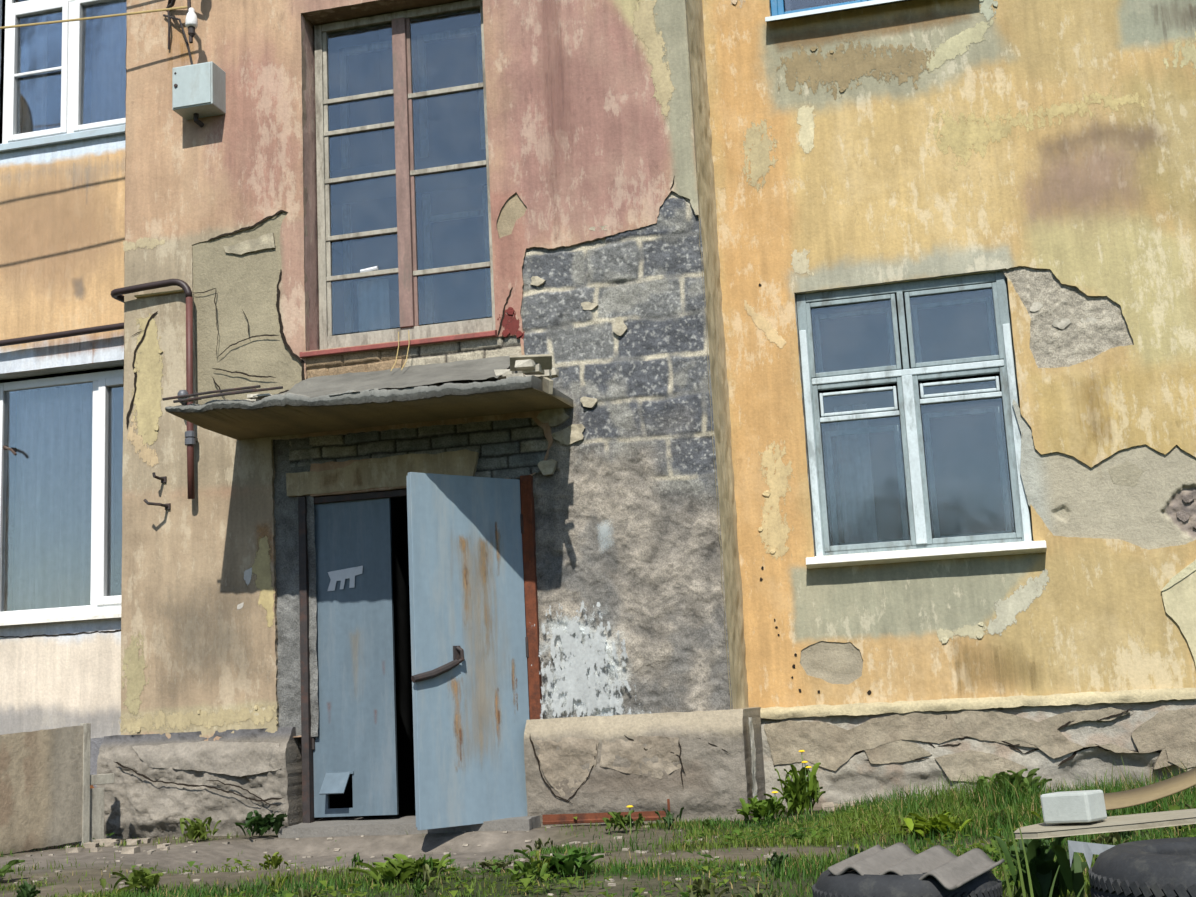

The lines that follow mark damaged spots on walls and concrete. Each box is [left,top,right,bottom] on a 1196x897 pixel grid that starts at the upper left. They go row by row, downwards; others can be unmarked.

peeling [633,0,676,123]
peeling [776,0,998,153]
crack [126,311,158,428]
spalling [1002,267,1133,368]
spalling [119,191,733,777]
rust [460,523,500,594]
peeling [758,440,794,581]
spalling [1012,399,1196,550]
spalling [791,641,863,693]
crack [115,762,284,806]
crack [914,715,972,760]
crack [994,708,1161,766]